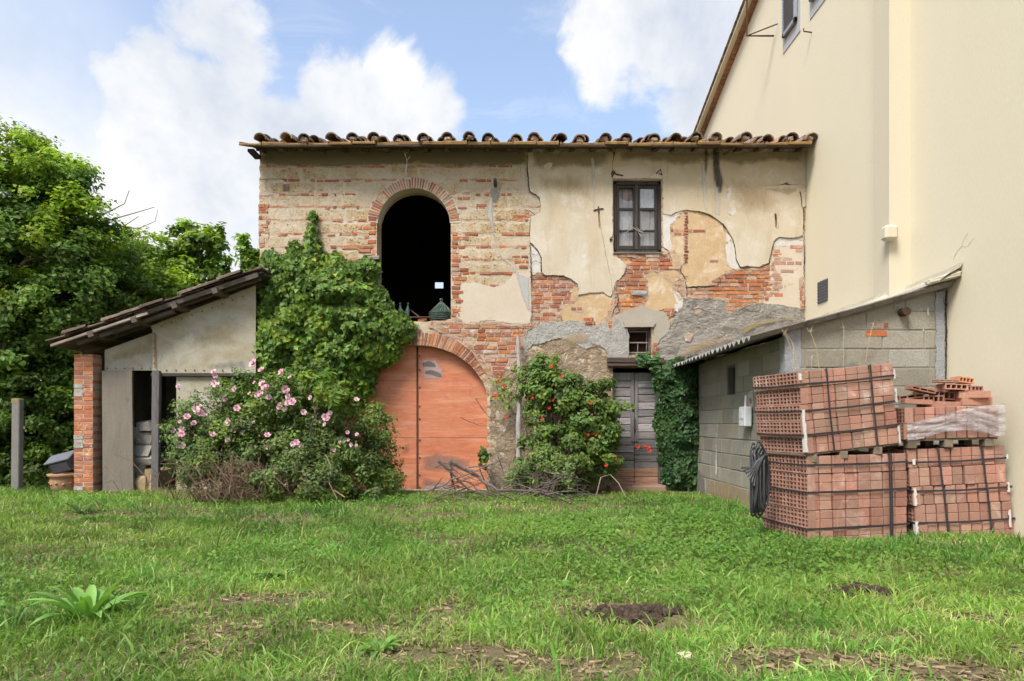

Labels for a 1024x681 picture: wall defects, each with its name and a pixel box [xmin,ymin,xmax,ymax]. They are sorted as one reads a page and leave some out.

damp [624,149,799,214]
spalling [429,211,805,401]